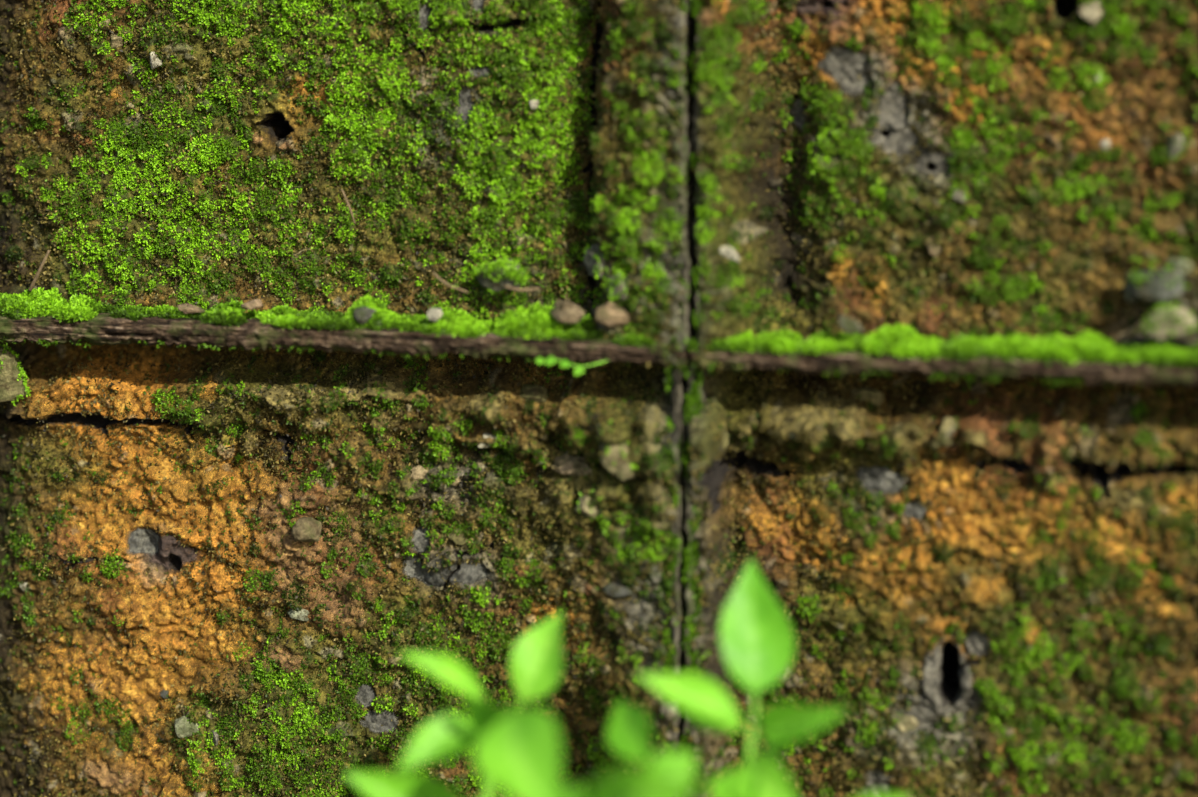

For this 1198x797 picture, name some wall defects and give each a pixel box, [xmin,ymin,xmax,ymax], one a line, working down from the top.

crack [582,0,614,246]
crack [588,276,596,305]
crack [0,412,196,439]
crack [970,456,1035,479]
crack [1063,455,1198,503]